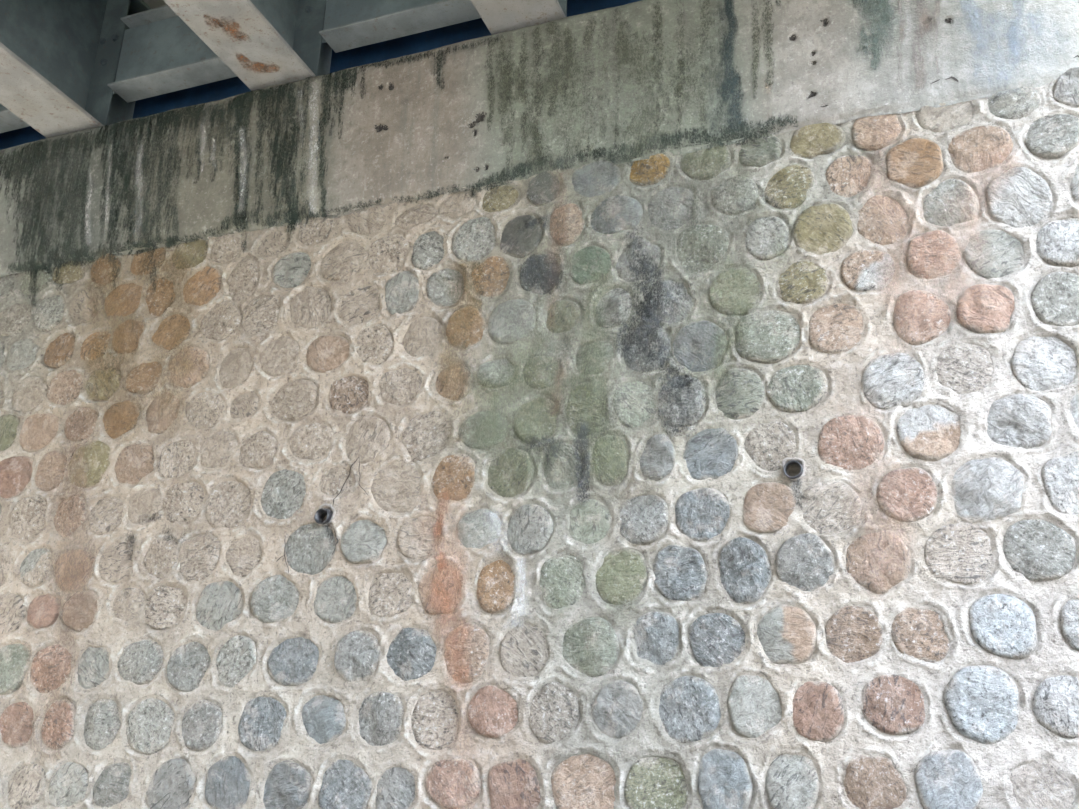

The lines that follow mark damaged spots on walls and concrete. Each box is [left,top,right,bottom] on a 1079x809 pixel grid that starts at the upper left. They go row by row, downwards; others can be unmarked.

rust [204,15,249,40]
rust [236,54,279,73]
damp [485,27,544,168]
damp [719,0,781,133]
damp [616,227,692,436]
damp [527,423,590,502]